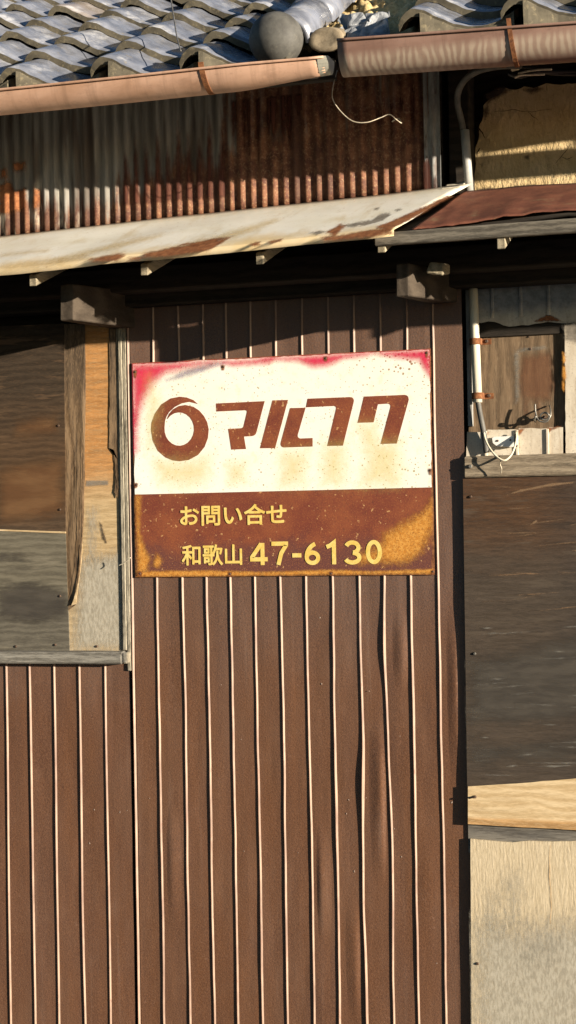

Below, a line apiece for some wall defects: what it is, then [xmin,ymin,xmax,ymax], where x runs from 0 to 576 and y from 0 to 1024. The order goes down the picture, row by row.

corrosion [232,94,302,146]
corrosion [0,162,40,214]
corrosion [123,126,226,204]